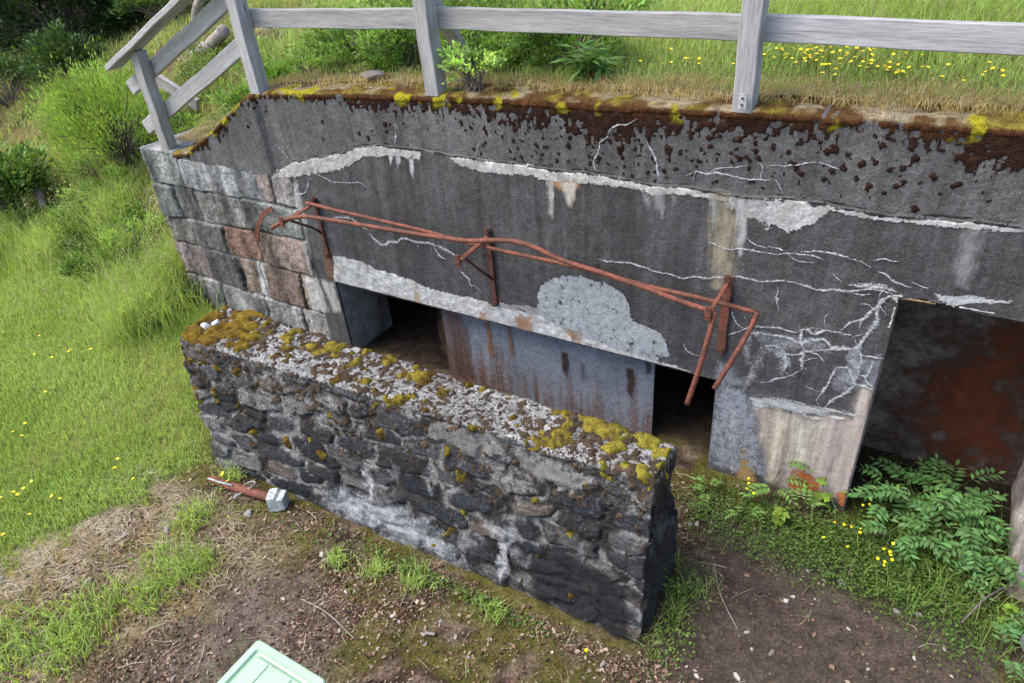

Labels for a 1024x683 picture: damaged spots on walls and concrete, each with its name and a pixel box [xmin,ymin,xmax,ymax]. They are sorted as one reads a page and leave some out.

spalling [272,146,421,180]
crack [255,115,1023,229]
spalling [450,157,1024,233]
crack [335,217,479,290]
corrosion [443,311,467,372]
peeling [333,256,690,372]
corrosion [508,317,531,355]
corrosion [561,330,577,375]
corrosion [626,369,634,396]
crack [599,235,926,408]
water stain [709,335,881,499]
corrosion [788,467,820,495]